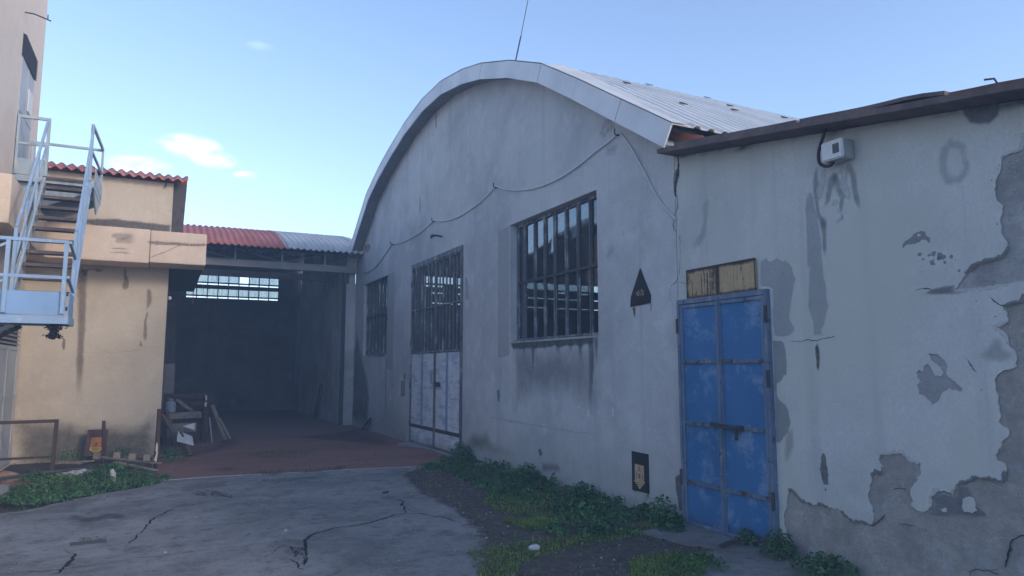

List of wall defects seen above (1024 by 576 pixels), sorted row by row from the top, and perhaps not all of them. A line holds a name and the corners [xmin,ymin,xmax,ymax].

damp [964,102,1023,123]
damp [78,269,100,371]
damp [512,335,593,366]
flaking render [784,132,1024,576]
crack [289,513,454,565]